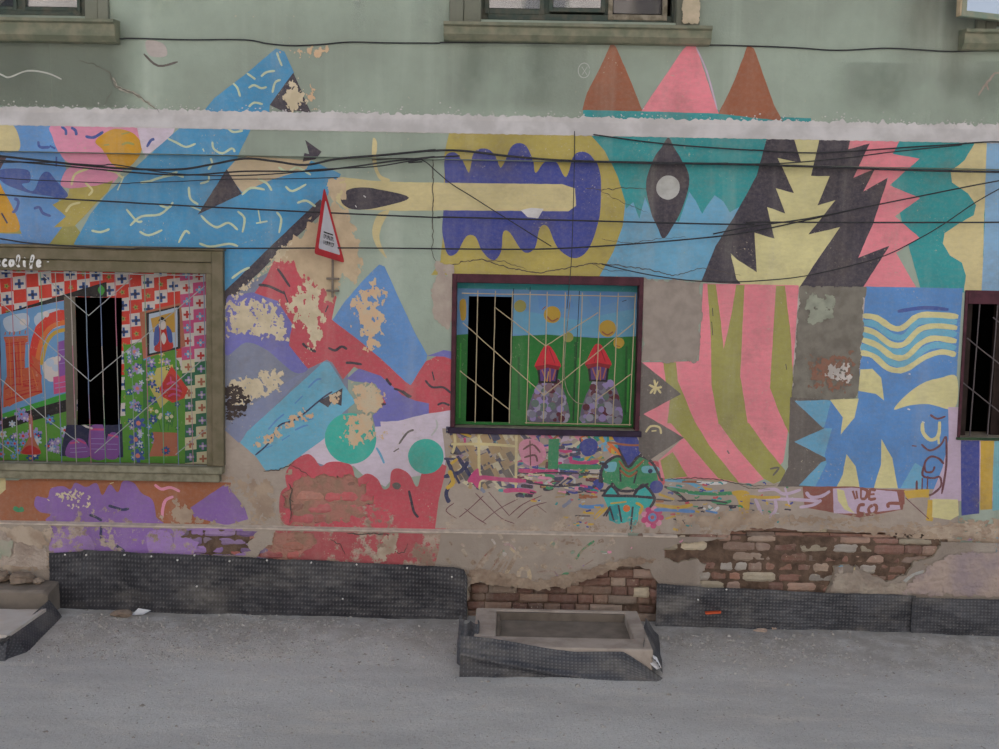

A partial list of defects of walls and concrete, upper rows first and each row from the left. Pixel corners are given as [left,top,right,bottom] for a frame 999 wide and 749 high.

peeling [682,0,700,24]
peeling [279,45,329,58]
peeling [282,78,317,113]
peeling [805,292,835,325]
peeling [825,363,852,383]
peeling [225,368,284,424]
peeling [253,408,314,448]
peeling [339,382,388,449]
peeling [55,488,91,509]
spalling [171,473,374,560]
spalling [0,525,53,573]
spalling [467,508,999,621]